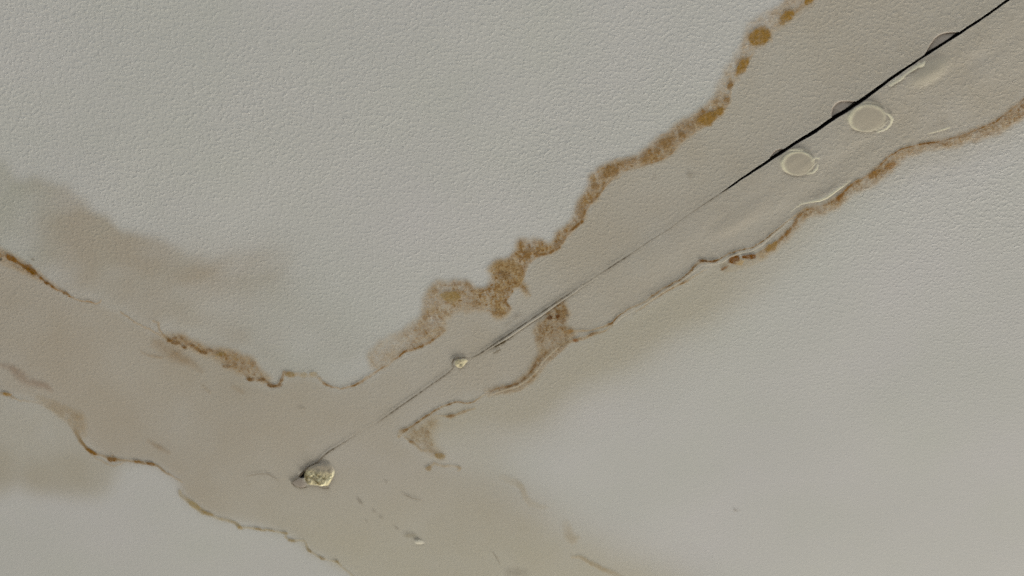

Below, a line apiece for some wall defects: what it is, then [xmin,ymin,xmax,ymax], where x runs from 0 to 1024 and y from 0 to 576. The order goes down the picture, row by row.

water stain [749,29,770,45]
water stain [633,124,683,165]
water stain [685,98,724,130]
crack [697,0,1010,209]
water stain [917,98,1024,151]
water stain [824,177,866,210]
water stain [766,228,792,251]
water stain [38,207,219,320]
water stain [507,241,561,283]
water stain [411,260,528,345]
crack [381,229,669,420]
crack [303,441,346,471]